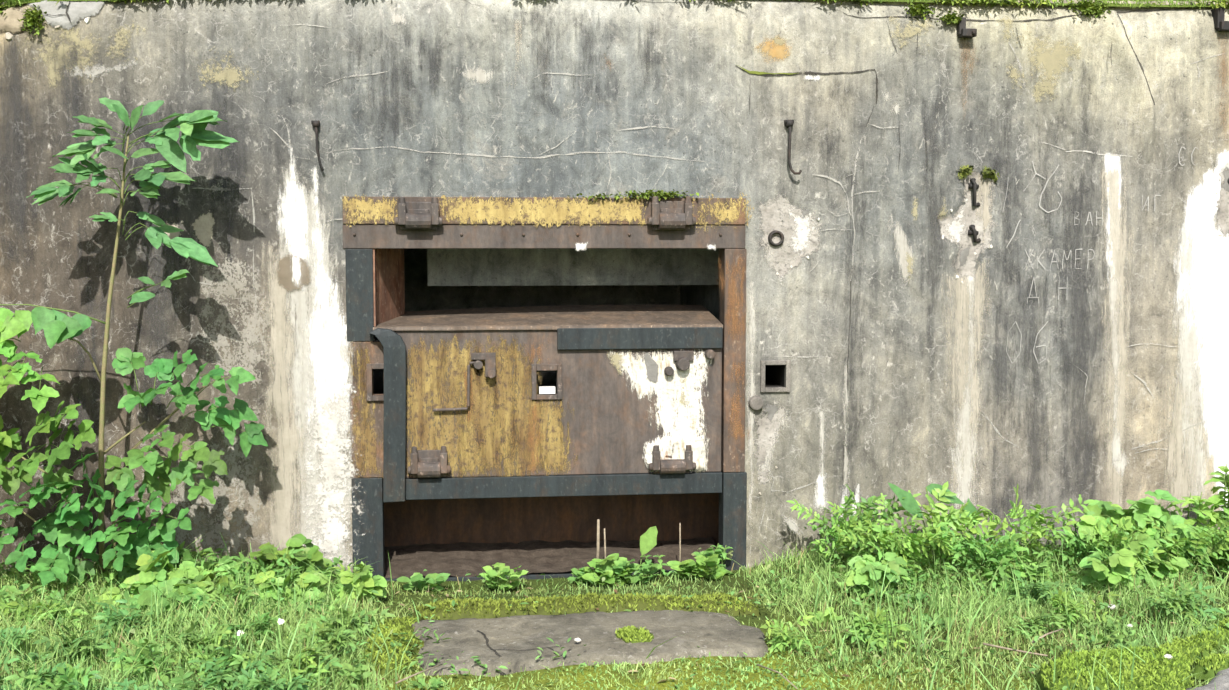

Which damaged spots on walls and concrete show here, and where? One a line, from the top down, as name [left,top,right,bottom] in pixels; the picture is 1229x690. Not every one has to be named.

leakage [381,58,409,139]
leakage [462,66,492,82]
peeling [342,195,398,227]
peeling [440,195,647,227]
spalling [692,191,823,284]
spalling [937,165,998,284]
crack [735,8,1229,533]
spalling [1215,169,1229,237]
leakage [262,148,363,567]
leakage [1025,335,1044,489]
leakage [1061,154,1133,508]
leakage [1165,151,1229,519]